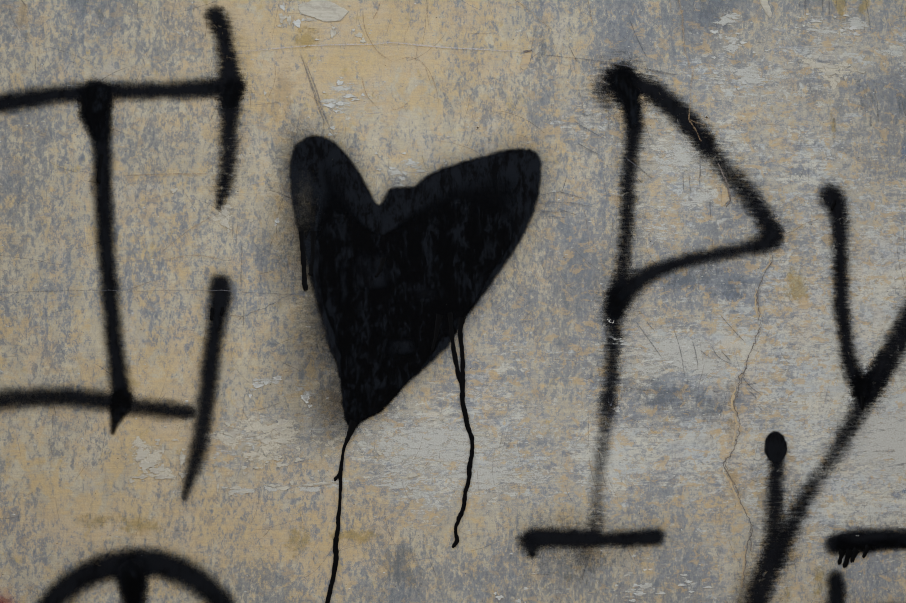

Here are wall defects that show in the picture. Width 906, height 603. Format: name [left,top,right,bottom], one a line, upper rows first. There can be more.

flaking render [277,0,351,39]
flaking render [320,77,365,136]
flaking render [248,375,328,408]
crack [723,219,817,603]
flaking render [125,436,187,484]